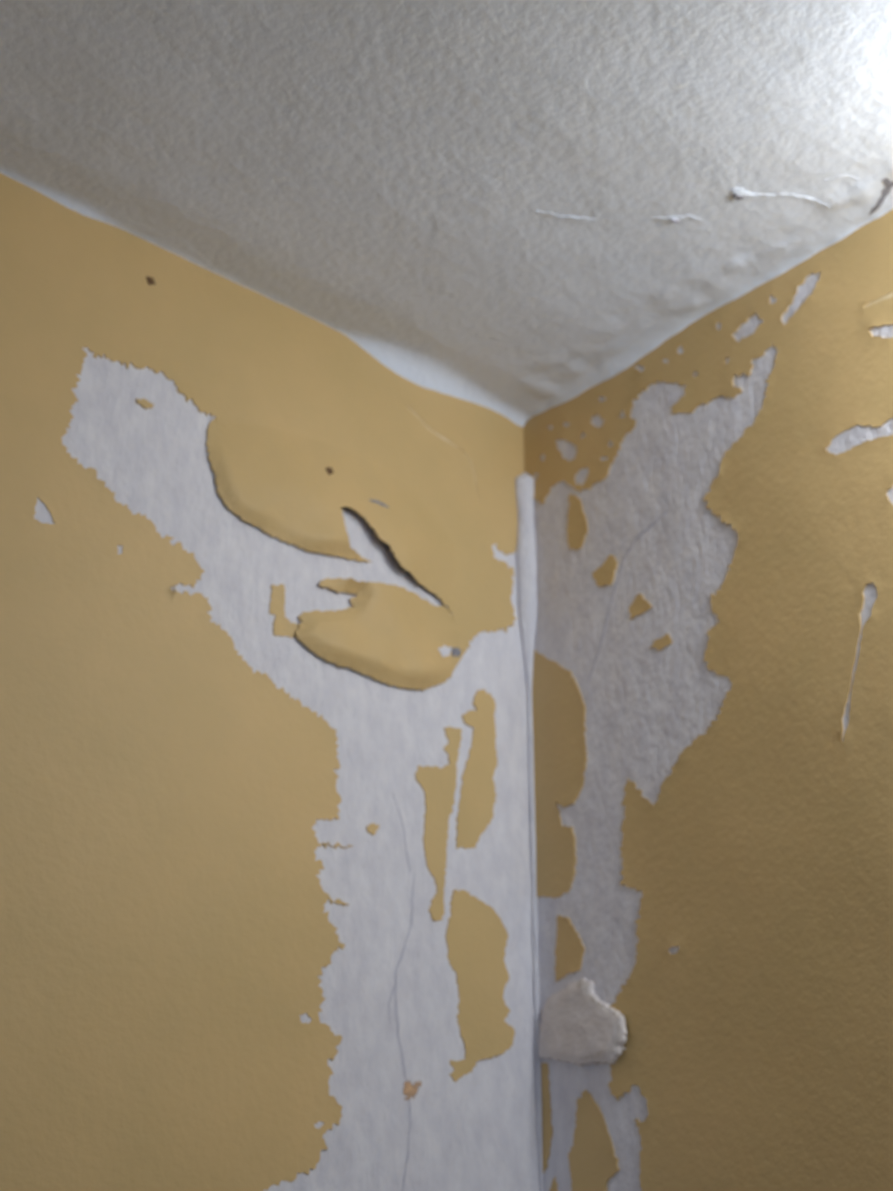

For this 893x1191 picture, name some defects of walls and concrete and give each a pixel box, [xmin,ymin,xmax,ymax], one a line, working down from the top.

crack [869,178,893,215]
peeling [770,272,821,324]
peeling [716,313,763,342]
peeling [825,418,893,455]
peeling [34,498,55,524]
peeling [62,343,778,1191]
crack [388,793,415,1191]